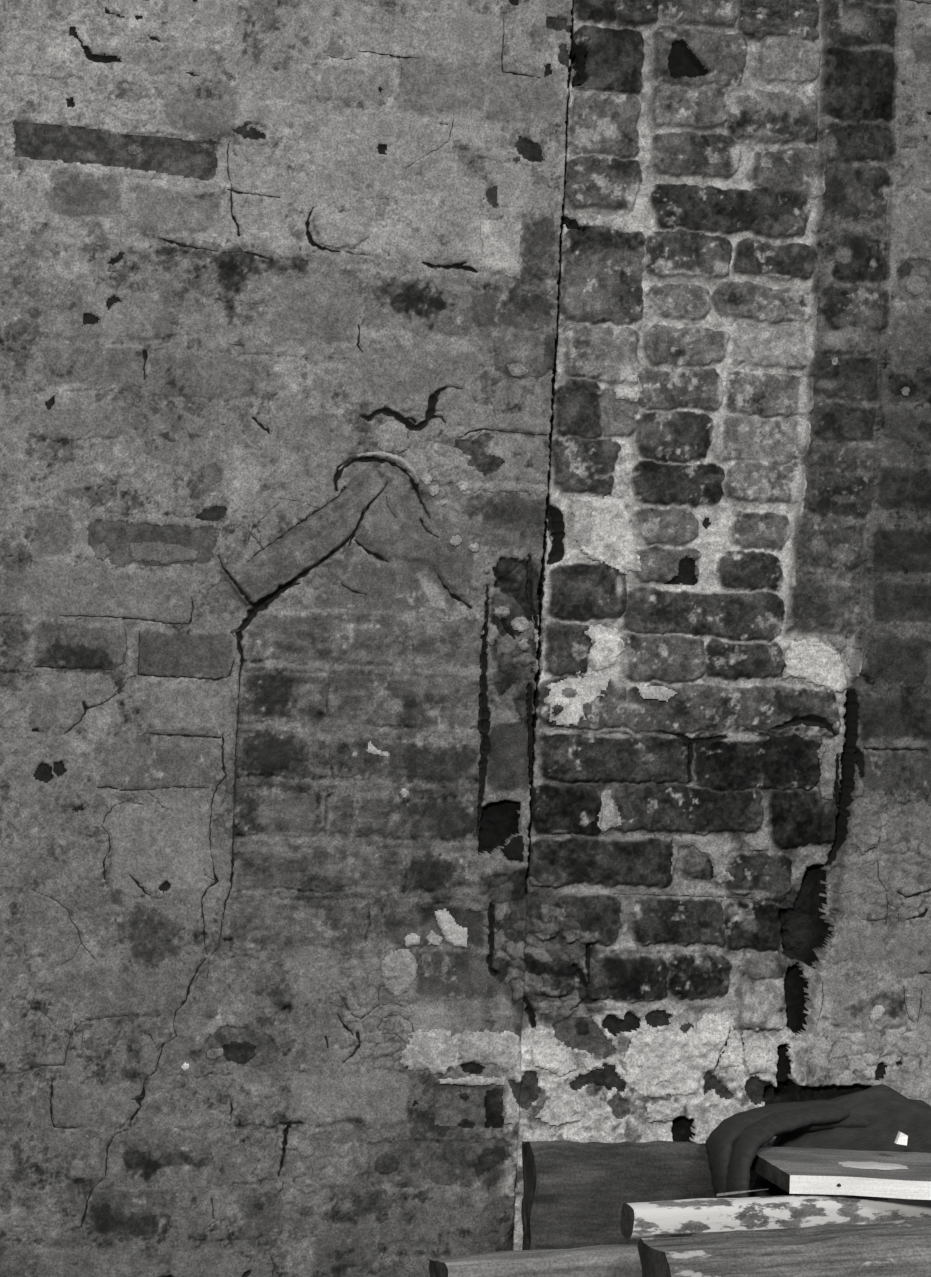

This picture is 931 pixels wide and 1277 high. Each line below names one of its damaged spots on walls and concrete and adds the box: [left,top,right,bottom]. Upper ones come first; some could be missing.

spalling [668,39,709,79]
spalling [513,136,545,162]
crack [358,1,587,894]
spalling [481,557,545,674]
peeling [635,685,678,702]
crack [20,457,439,1233]
peeling [597,790,622,833]
crack [772,689,931,925]
crack [487,904,497,976]
crack [524,998,536,1027]
crack [571,943,591,1010]
peeling [367,1010,776,1191]